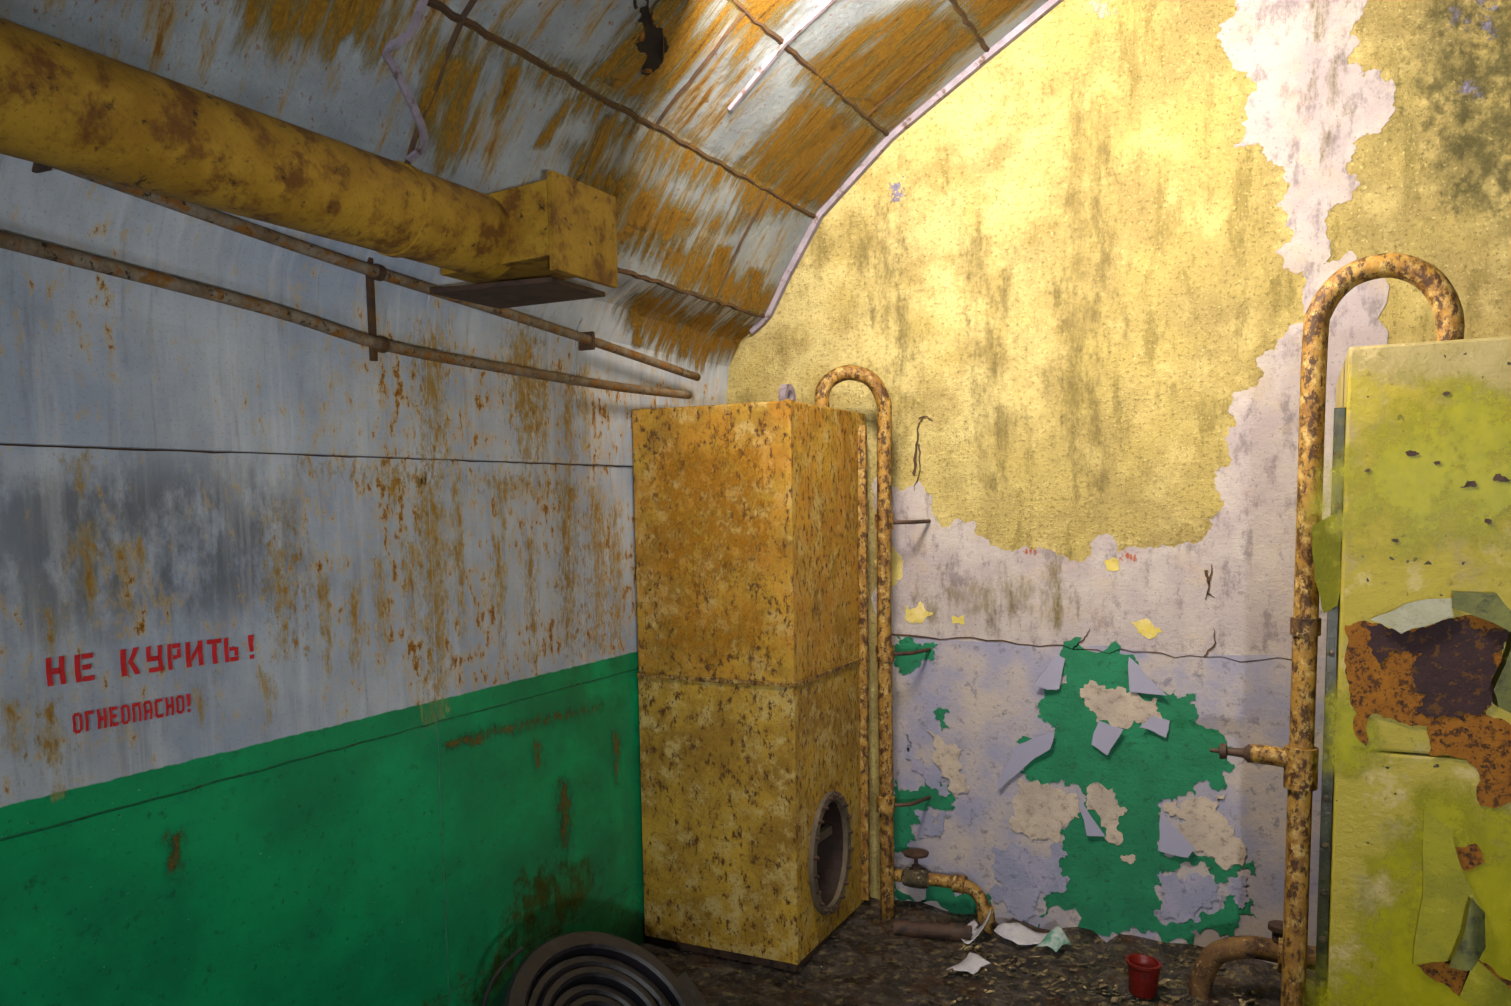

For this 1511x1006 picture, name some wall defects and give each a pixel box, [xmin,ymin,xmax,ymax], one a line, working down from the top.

corrosion [237,0,402,66]
water stain [1416,0,1511,212]
corrosion [414,0,1026,370]
peeling [871,0,1396,947]
corrosion [70,526,145,602]
corrosion [3,698,62,764]
corrosion [163,831,185,873]